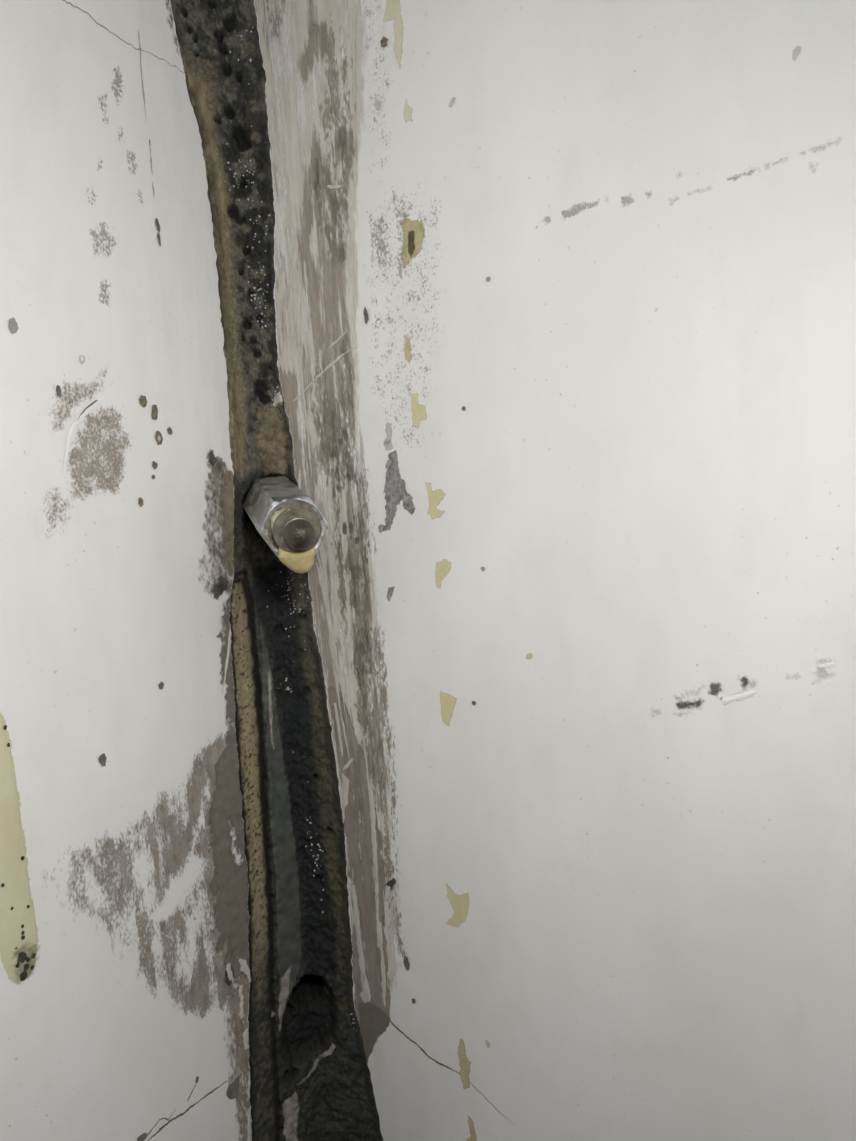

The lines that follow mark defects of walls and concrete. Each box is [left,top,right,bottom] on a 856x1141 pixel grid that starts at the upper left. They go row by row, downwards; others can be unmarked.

peeling [378,423,415,532]
crack [63,0,383,1141]
crack [390,1021,516,1125]